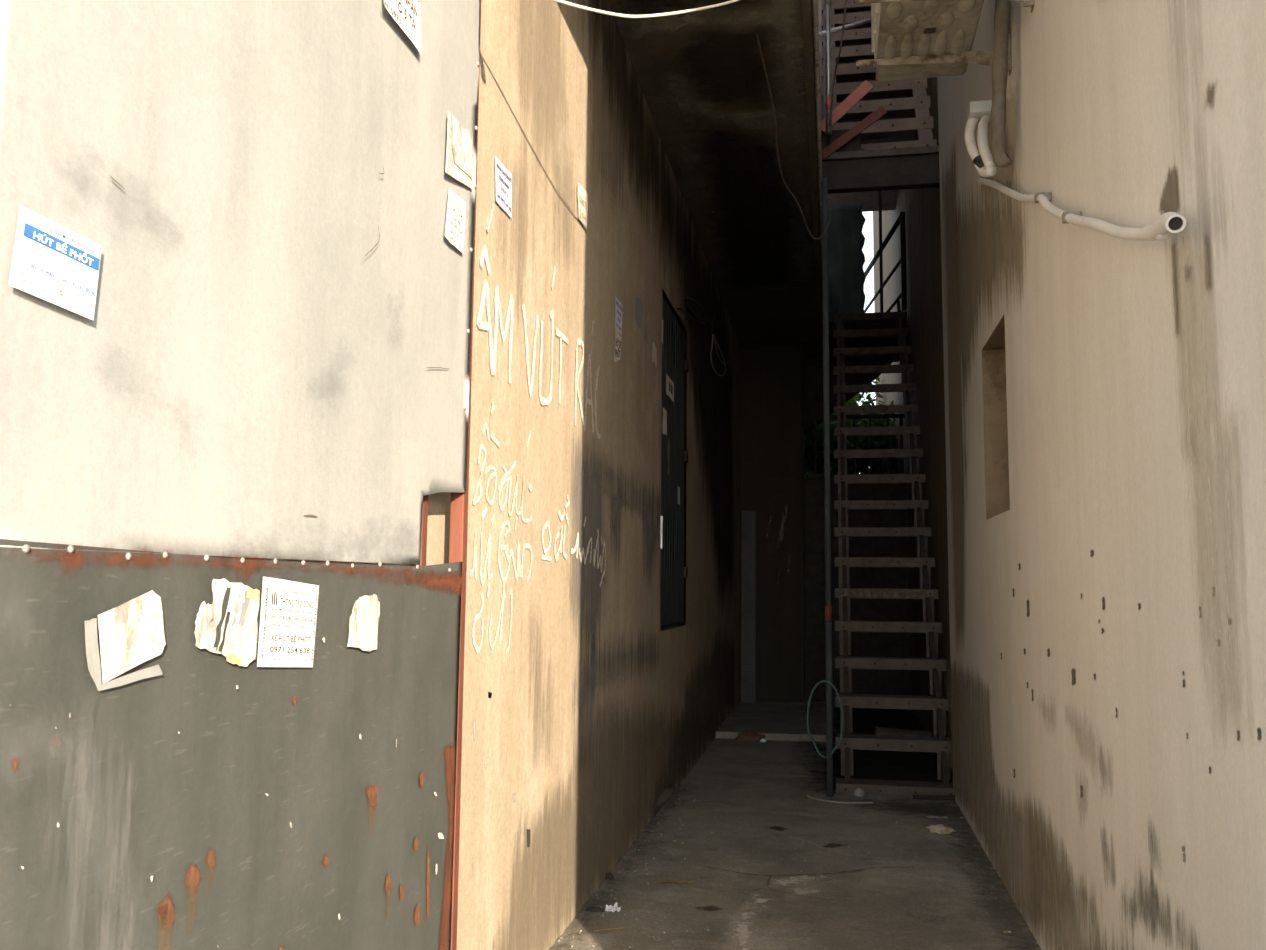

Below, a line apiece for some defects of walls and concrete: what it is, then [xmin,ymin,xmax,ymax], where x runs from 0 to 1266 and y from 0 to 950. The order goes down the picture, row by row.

water stain [1160,168,1179,213]
water stain [1172,245,1189,333]
water stain [502,451,734,950]
corrosion [156,894,174,929]
corrosion [186,849,215,893]
corrosion [367,785,378,808]
corrosion [385,874,404,901]
corrosion [414,745,455,950]
water stain [871,663,1097,950]
water stain [1122,827,1197,950]